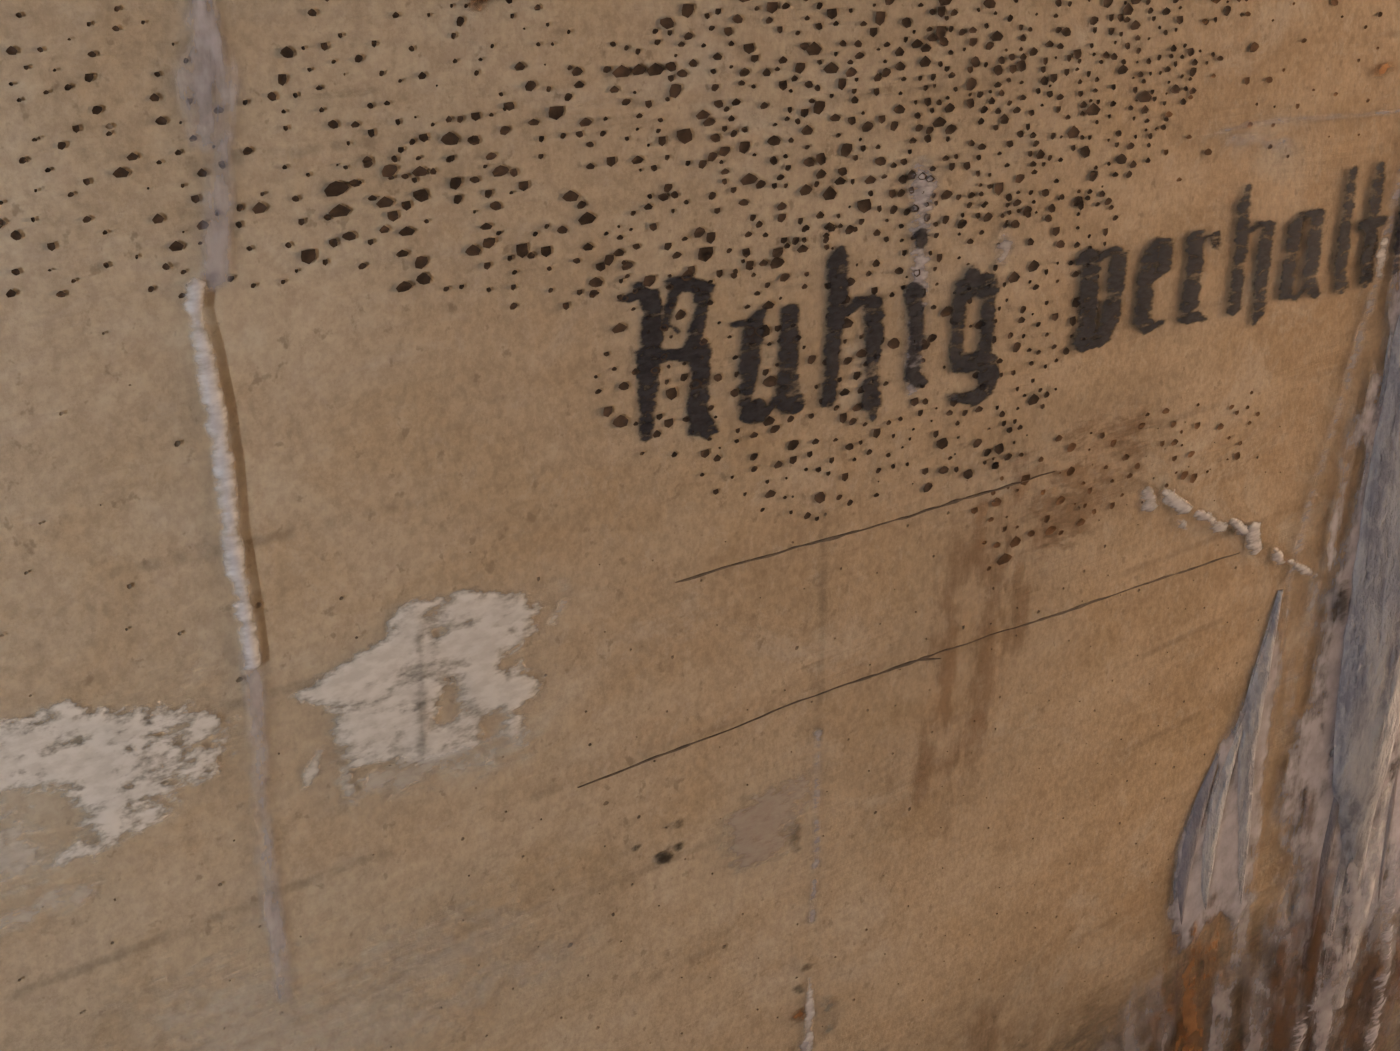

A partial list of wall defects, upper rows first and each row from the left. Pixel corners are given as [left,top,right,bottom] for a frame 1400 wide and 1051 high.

leakage [194,0,234,134]
leakage [185,229,260,705]
peeling [0,701,224,865]
peeling [296,590,538,795]